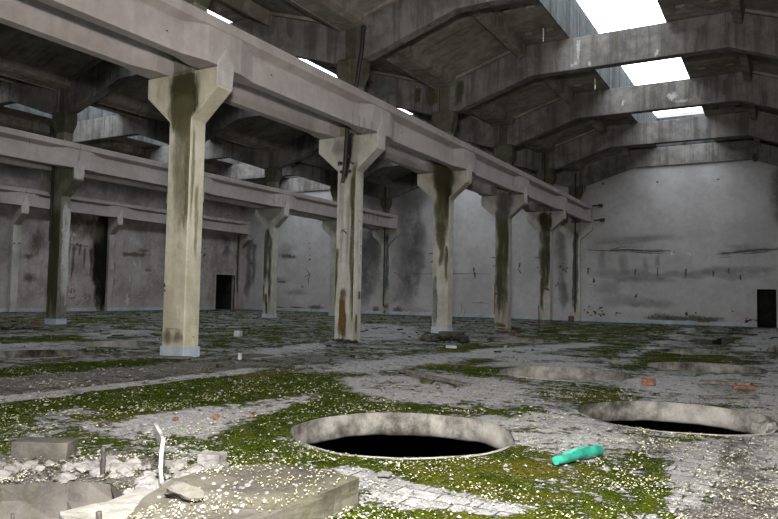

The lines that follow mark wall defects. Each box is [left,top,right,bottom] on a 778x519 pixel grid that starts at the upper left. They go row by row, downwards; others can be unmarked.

water stain [69,214,110,310]
rust [338,290,357,336]
water stain [352,233,389,319]
water stain [437,172,451,277]
water stain [496,220,509,309]
water stain [540,233,579,308]